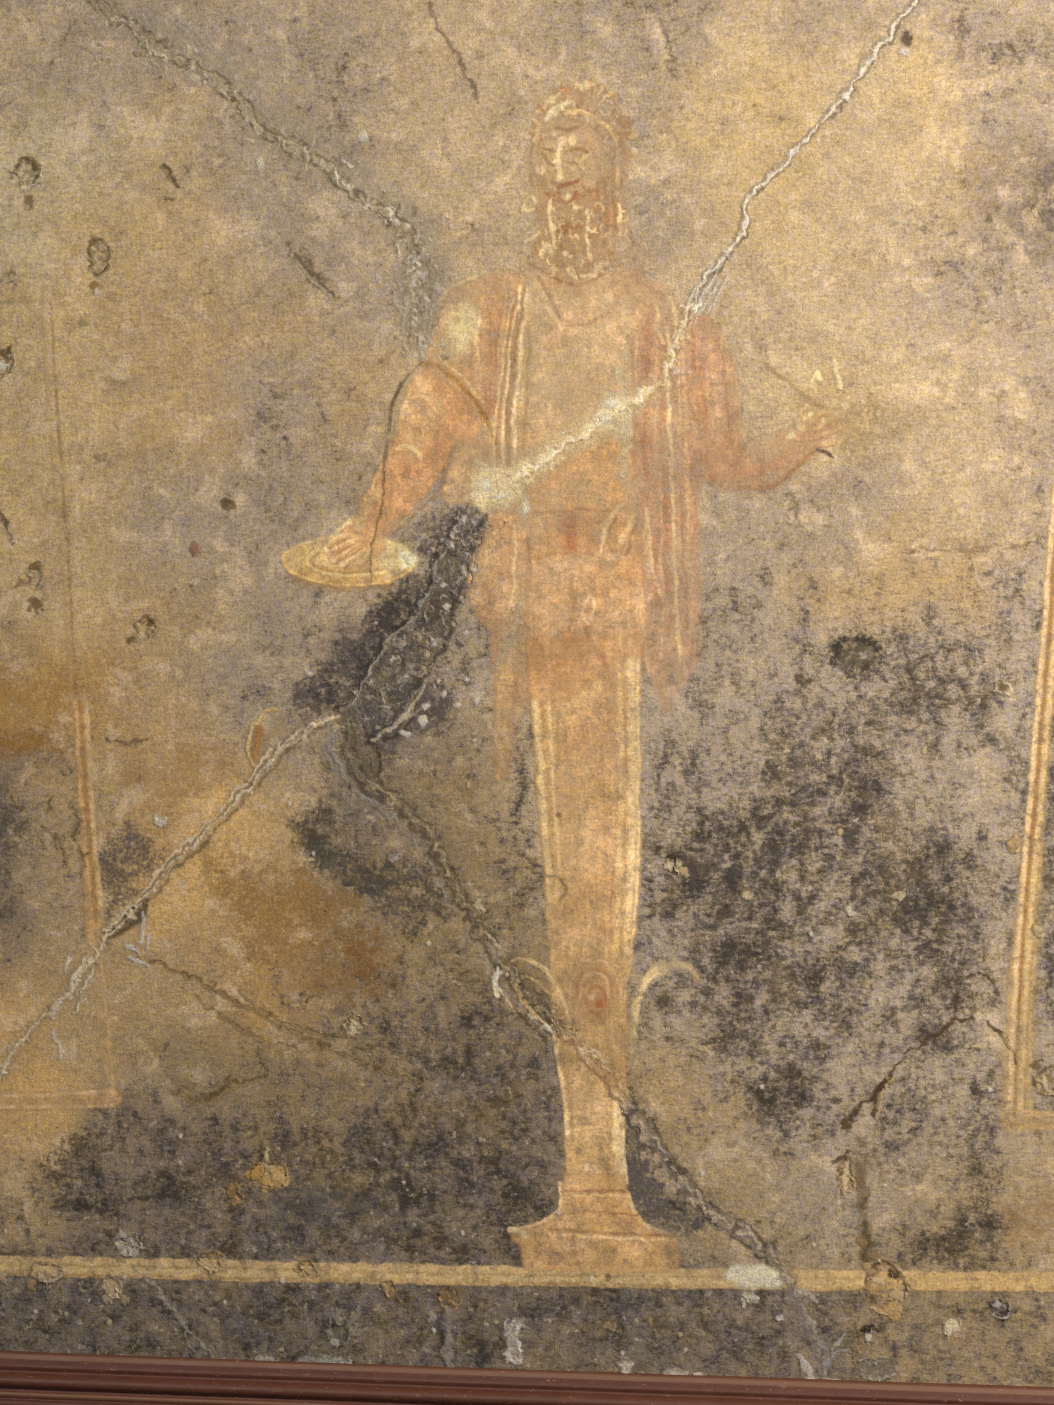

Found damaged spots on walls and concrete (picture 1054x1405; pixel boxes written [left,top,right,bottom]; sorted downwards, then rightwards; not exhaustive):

spalling [14,156,44,208]
spalling [88,238,111,295]
crack [71,0,451,542]
crack [468,0,920,514]
spalling [337,500,505,742]
leakage [830,635,882,677]
leakage [98,823,165,918]
leakage [287,800,460,942]
crack [0,708,847,1380]
crack [850,972,1017,1119]
leakage [624,1112,705,1233]
spalling [833,1116,914,1382]